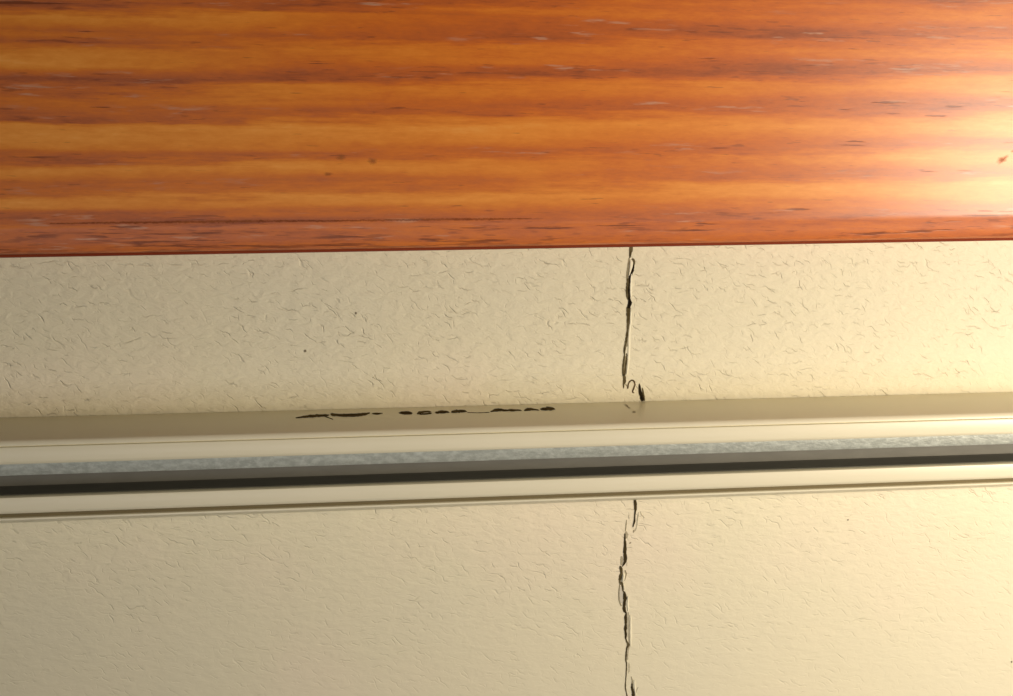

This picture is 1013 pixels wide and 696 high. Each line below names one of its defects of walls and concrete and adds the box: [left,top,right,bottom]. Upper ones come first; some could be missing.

crack [622,247,645,401]
crack [618,500,639,696]